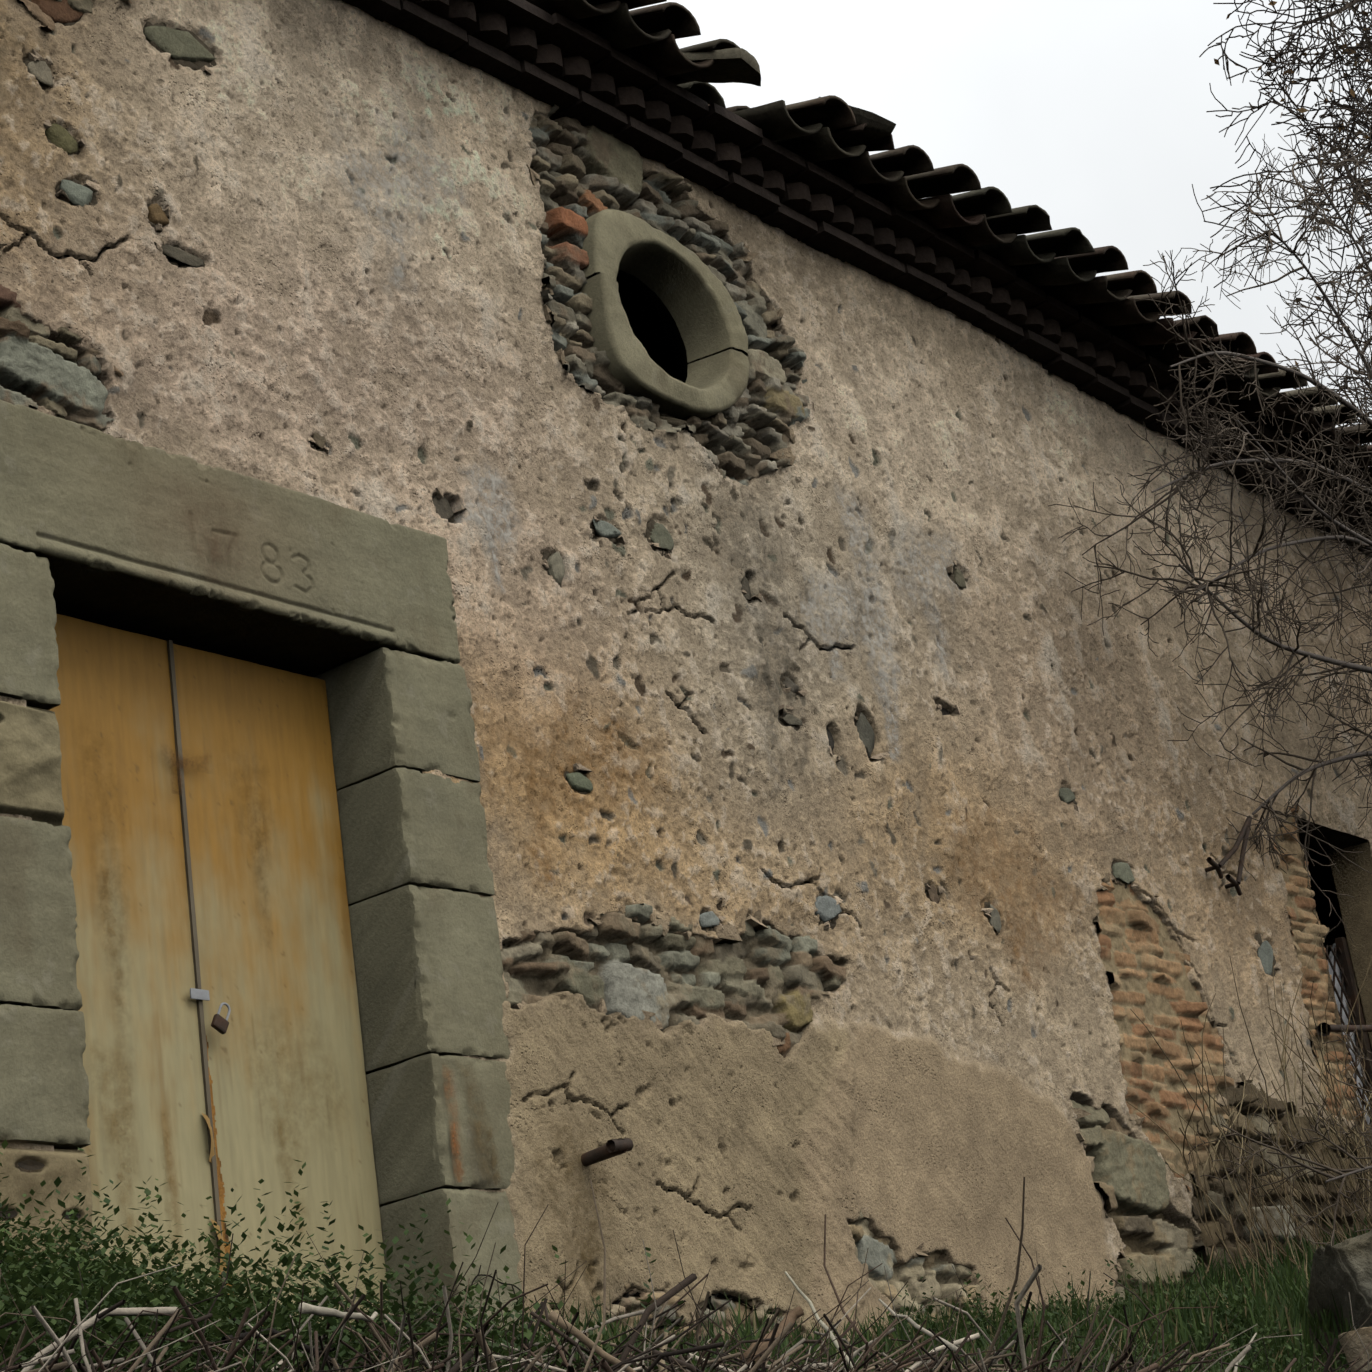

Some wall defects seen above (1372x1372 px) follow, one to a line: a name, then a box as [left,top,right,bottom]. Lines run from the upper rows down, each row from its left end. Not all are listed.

flaking render [19,0,93,32]
flaking render [143,16,217,75]
flaking render [55,178,101,206]
crack [14,229,124,264]
flaking render [526,104,810,486]
flaking render [0,284,124,431]
crack [792,626,851,651]
flaking render [501,894,846,1058]
flaking render [1071,805,1372,1305]
crack [656,1184,748,1218]
spalling [847,1207,987,1332]
peeling [606,1280,808,1346]